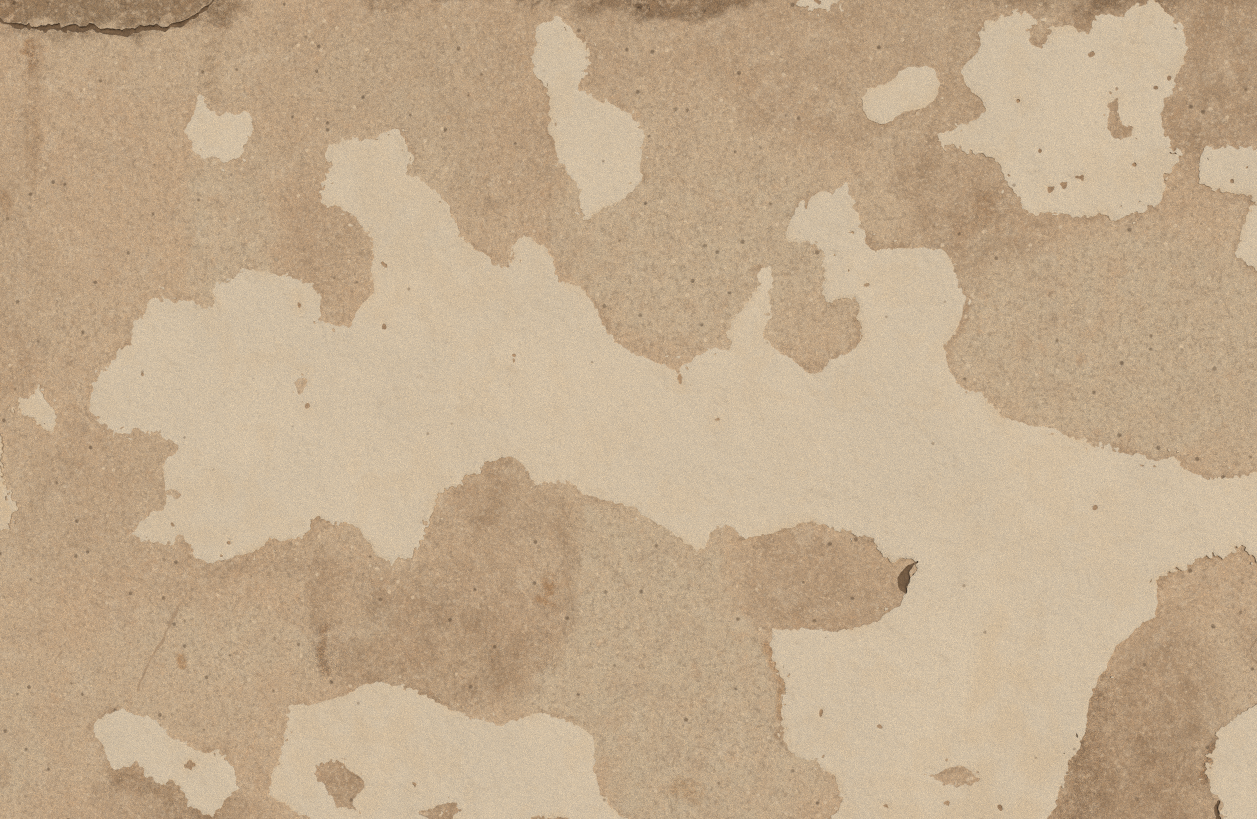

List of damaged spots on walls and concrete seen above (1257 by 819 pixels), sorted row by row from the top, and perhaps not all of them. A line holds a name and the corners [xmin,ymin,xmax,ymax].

peeling [0,0,213,30]
crack [0,0,215,37]
peeling [796,0,840,12]
peeling [184,94,254,163]
peeling [531,16,645,220]
peeling [938,0,1188,221]
peeling [1199,145,1257,271]
peeling [293,374,310,409]
peeling [0,433,19,531]
peeling [728,520,918,632]
peeling [1047,545,1257,819]
peeling [93,708,240,817]